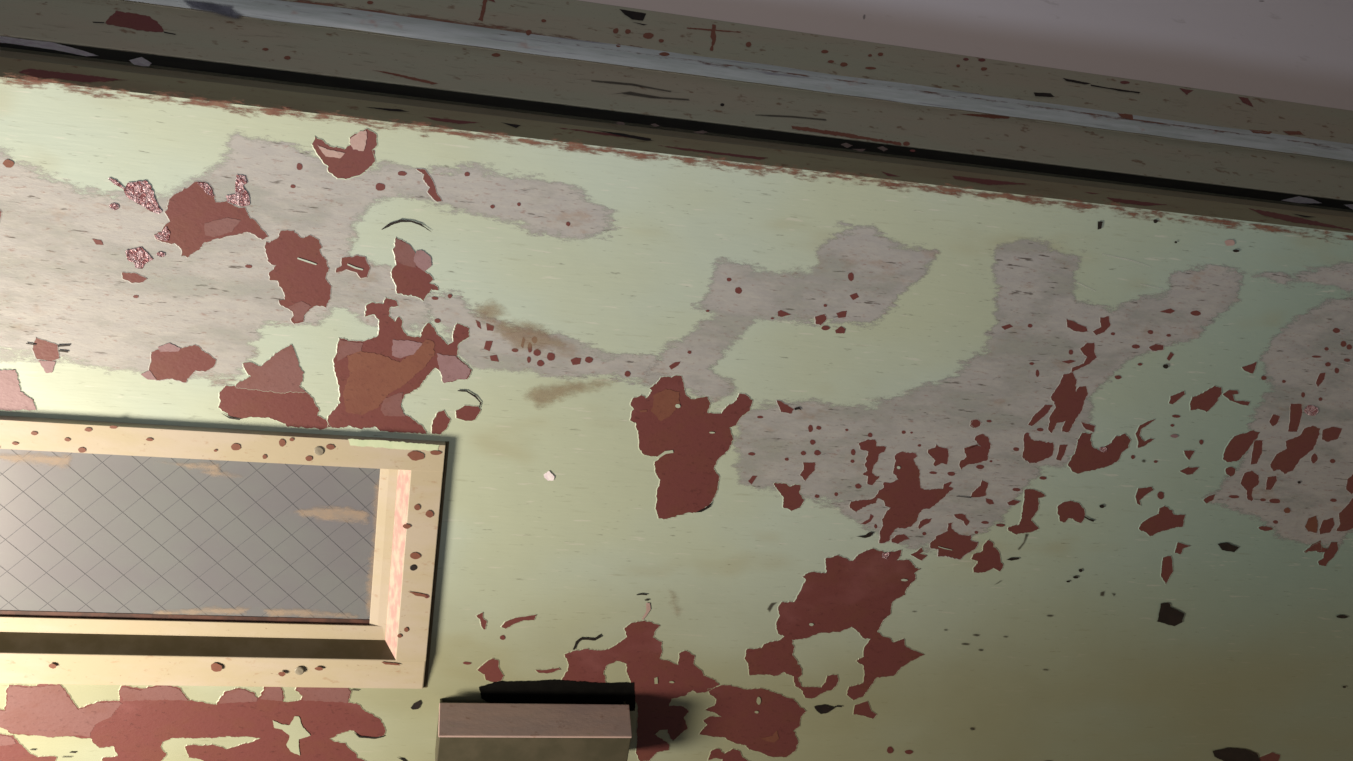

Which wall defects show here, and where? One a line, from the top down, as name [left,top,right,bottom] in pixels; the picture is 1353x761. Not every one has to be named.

peeling [561,122,766,160]
peeling [1249,208,1351,230]
peeling [0,128,1251,761]
peeling [1203,328,1352,532]
peeling [1303,474,1353,567]
peeling [1213,748,1281,761]